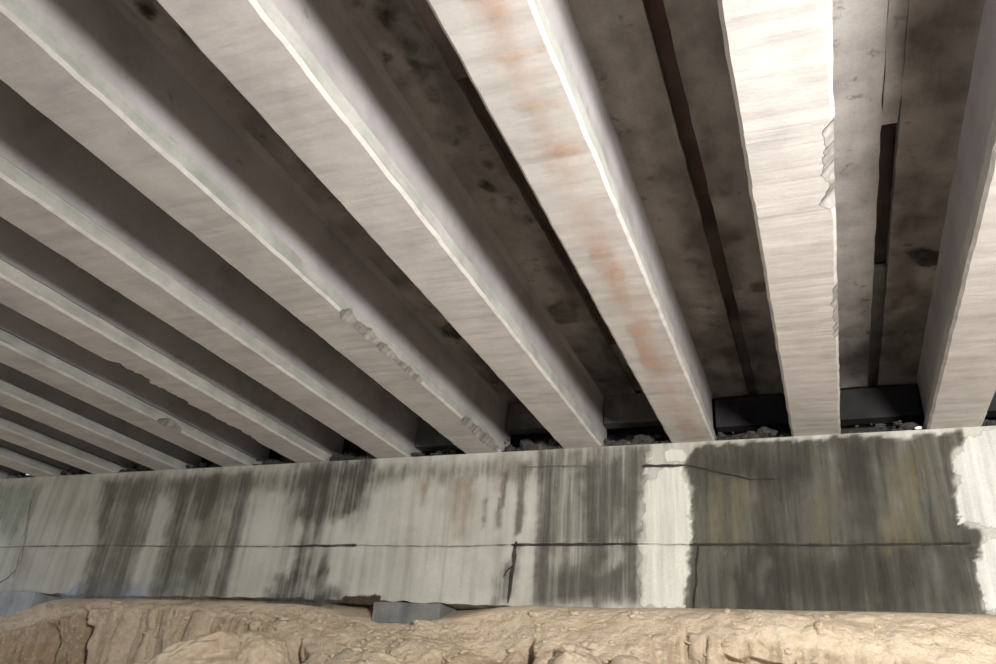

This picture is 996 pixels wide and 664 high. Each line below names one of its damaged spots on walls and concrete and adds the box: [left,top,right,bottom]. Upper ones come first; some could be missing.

spalling [819,118,836,209]
spalling [340,308,422,382]
spalling [831,284,839,337]
damp [68,473,259,601]
crack [0,501,644,603]
damp [268,461,406,606]
damp [486,447,642,607]
crack [682,542,971,609]
damp [684,431,985,615]
peeling [952,428,996,612]